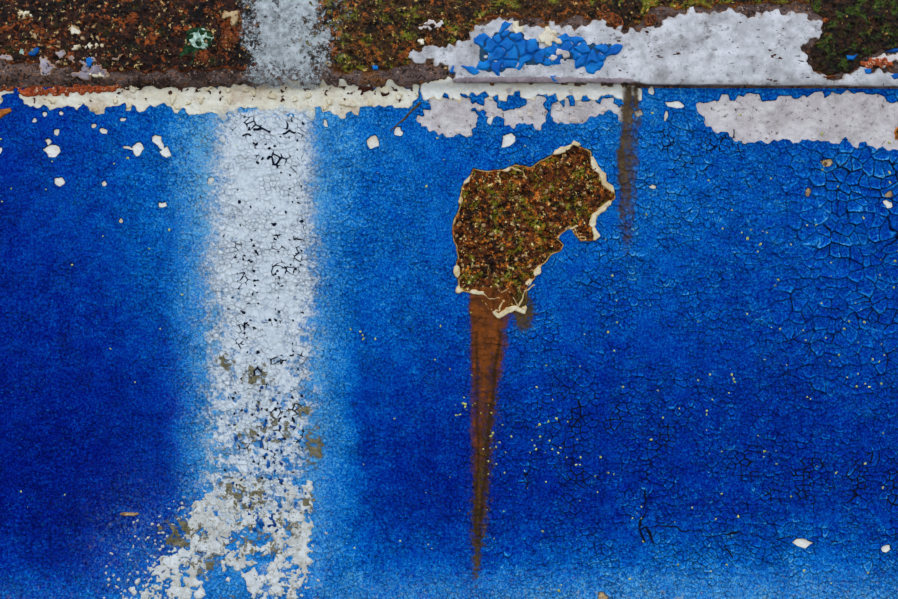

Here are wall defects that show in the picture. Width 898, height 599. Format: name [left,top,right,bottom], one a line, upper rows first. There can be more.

peeling [43,129,60,157]
corrosion [0,0,273,90]
peeling [123,135,171,157]
peeling [0,7,898,151]
crack [649,118,750,208]
crack [789,151,898,248]
crack [223,115,308,489]
corrosion [452,86,641,589]
crack [770,189,898,404]
peeling [124,419,314,599]
crack [515,378,631,500]
crack [637,403,898,559]